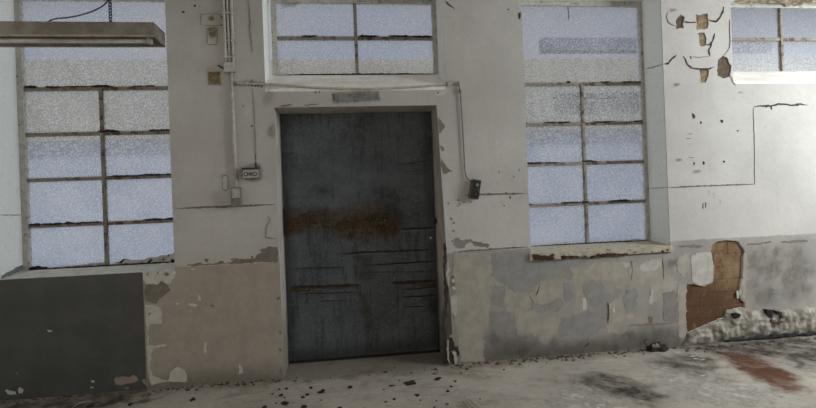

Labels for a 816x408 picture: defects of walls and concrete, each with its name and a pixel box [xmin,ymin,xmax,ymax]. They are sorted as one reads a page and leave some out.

spalling [696,14,708,46]
spalling [699,56,730,83]
crack [648,103,806,189]
peeling [187,246,279,270]
rust [533,251,637,261]
peeling [441,217,771,365]
peeling [114,270,187,389]